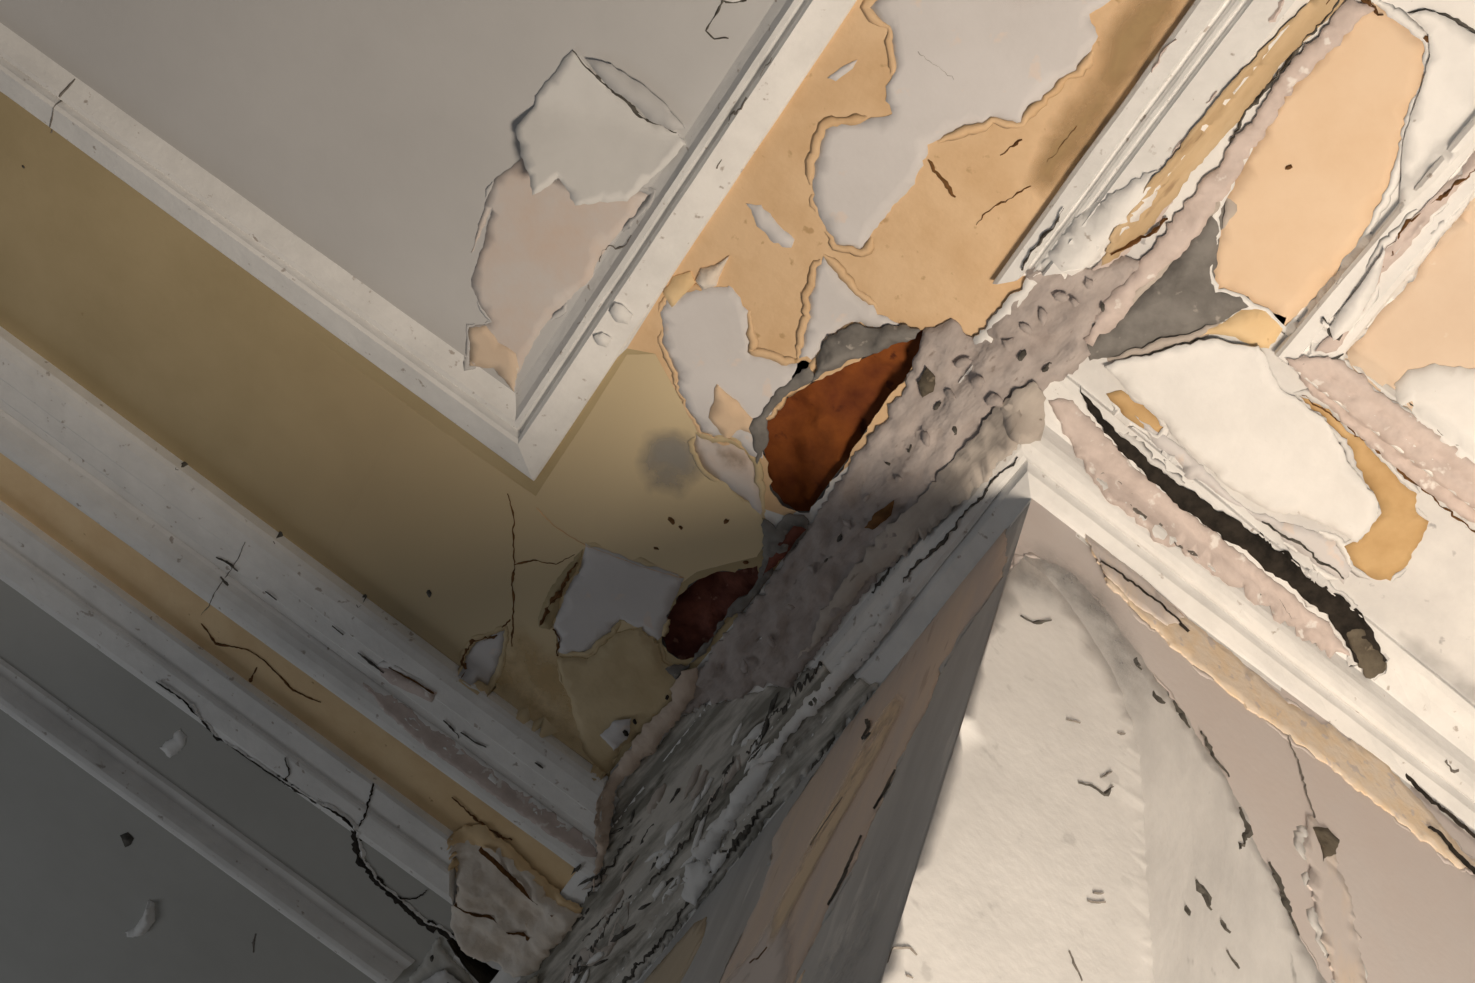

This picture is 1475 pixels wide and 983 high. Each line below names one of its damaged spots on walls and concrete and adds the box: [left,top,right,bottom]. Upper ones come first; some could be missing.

crack [484,494,683,646]
peeling [358,0,1475,983]
crack [1080,385,1390,681]
crack [156,680,456,941]
crack [1405,773,1475,875]